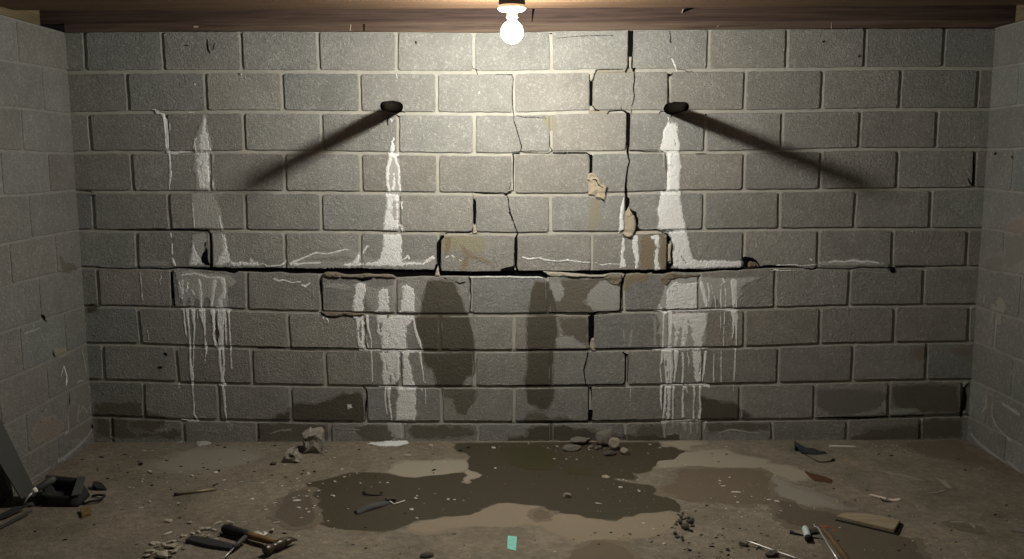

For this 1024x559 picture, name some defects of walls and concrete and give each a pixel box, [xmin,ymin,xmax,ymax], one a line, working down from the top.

leakage [123,109,769,533]
crack [100,31,924,423]
spalling [587,173,606,200]
spalling [623,207,700,286]